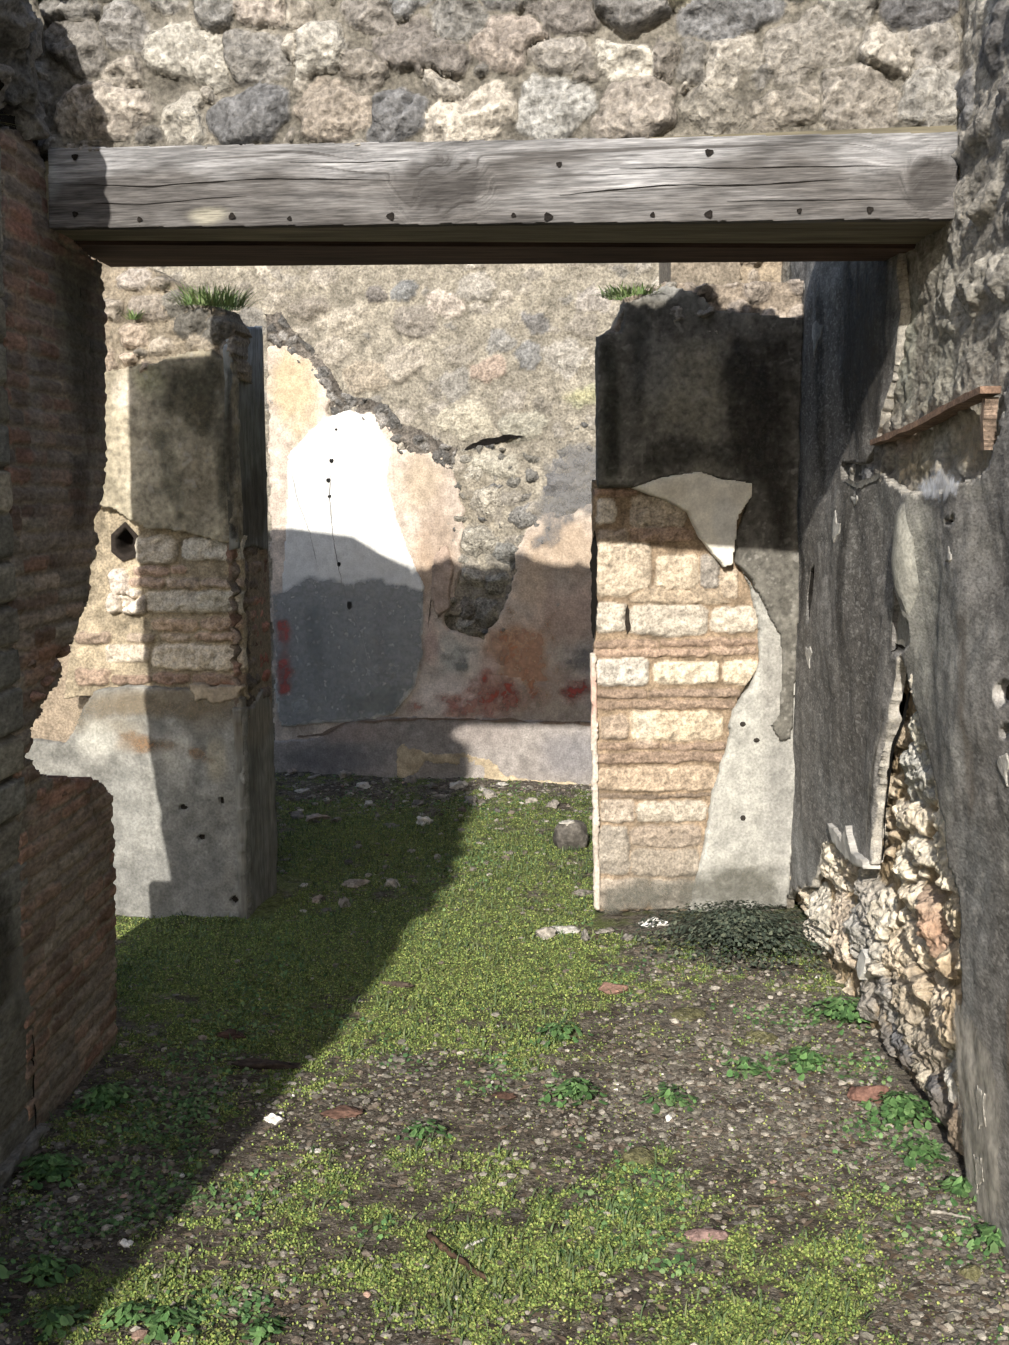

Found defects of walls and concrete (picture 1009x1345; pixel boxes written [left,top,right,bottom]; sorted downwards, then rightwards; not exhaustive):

damp [645,341,800,540]
damp [840,260,891,443]
spalling [27,506,250,704]
spalling [264,312,760,927]
spalling [790,674,1001,1226]